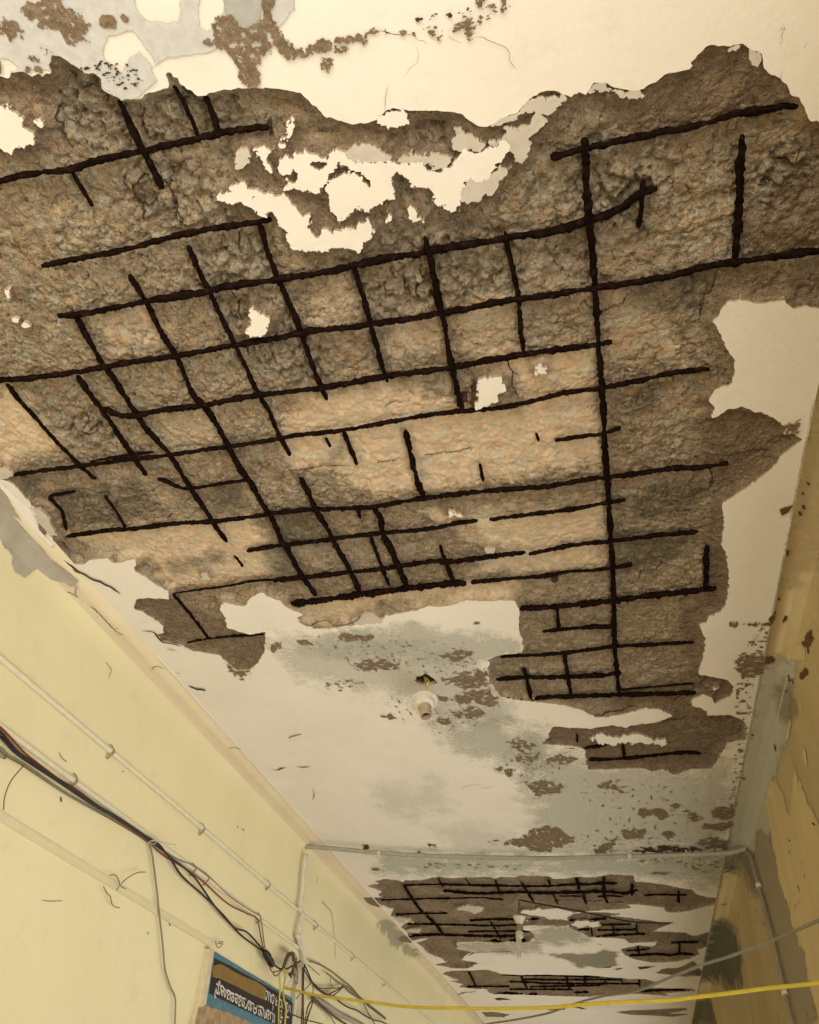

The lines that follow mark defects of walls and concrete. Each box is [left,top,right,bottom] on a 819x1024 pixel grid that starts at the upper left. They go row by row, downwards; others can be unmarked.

spalling [0,0,819,783]
corrosion [0,85,819,701]
peeling [495,738,578,798]
corrosion [569,734,701,762]
corrosion [381,876,687,943]
spalling [364,863,716,1000]
corrosion [568,917,699,957]
corrosion [467,971,693,995]